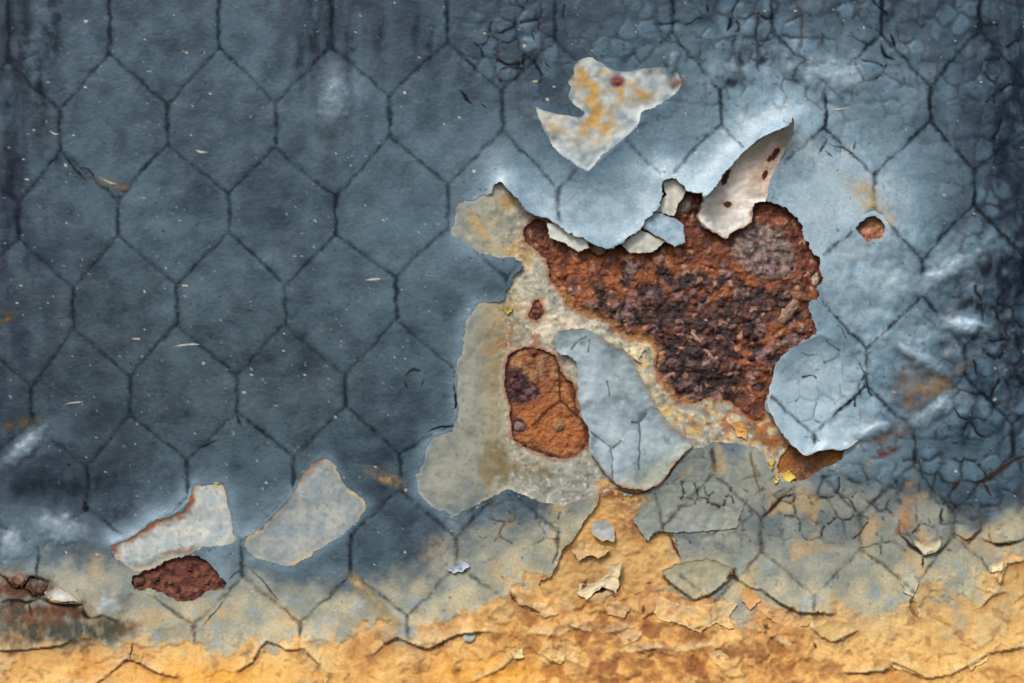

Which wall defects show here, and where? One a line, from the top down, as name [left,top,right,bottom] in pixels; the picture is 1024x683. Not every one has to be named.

peeling [535,57,681,170]
peeling [696,118,794,240]
rust [856,201,890,242]
peeling [110,458,366,571]
peeling [415,179,866,645]
crack [590,412,734,508]
rust [523,178,843,483]
crack [795,354,872,415]
crack [884,456,1024,566]
crack [2,576,115,621]
damp [0,604,124,643]
rust [132,555,226,602]